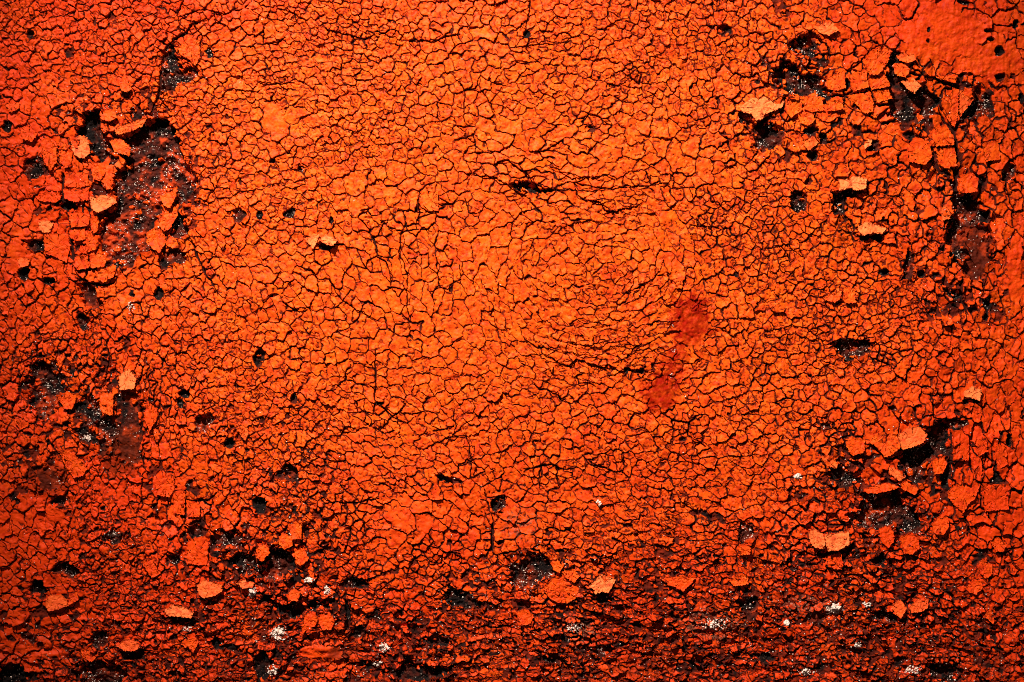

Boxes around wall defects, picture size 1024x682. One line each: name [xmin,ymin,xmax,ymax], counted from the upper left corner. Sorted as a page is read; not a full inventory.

crack [954,0,1024,60]
crack [72,138,120,225]
spalling [3,101,199,331]
crack [592,146,705,311]
spalling [738,21,994,282]
spalling [14,360,158,508]
spalling [141,476,310,589]
crack [332,345,399,411]
crack [405,257,510,380]
spalling [510,551,616,625]
spalling [807,419,1012,570]
crack [959,451,1024,561]